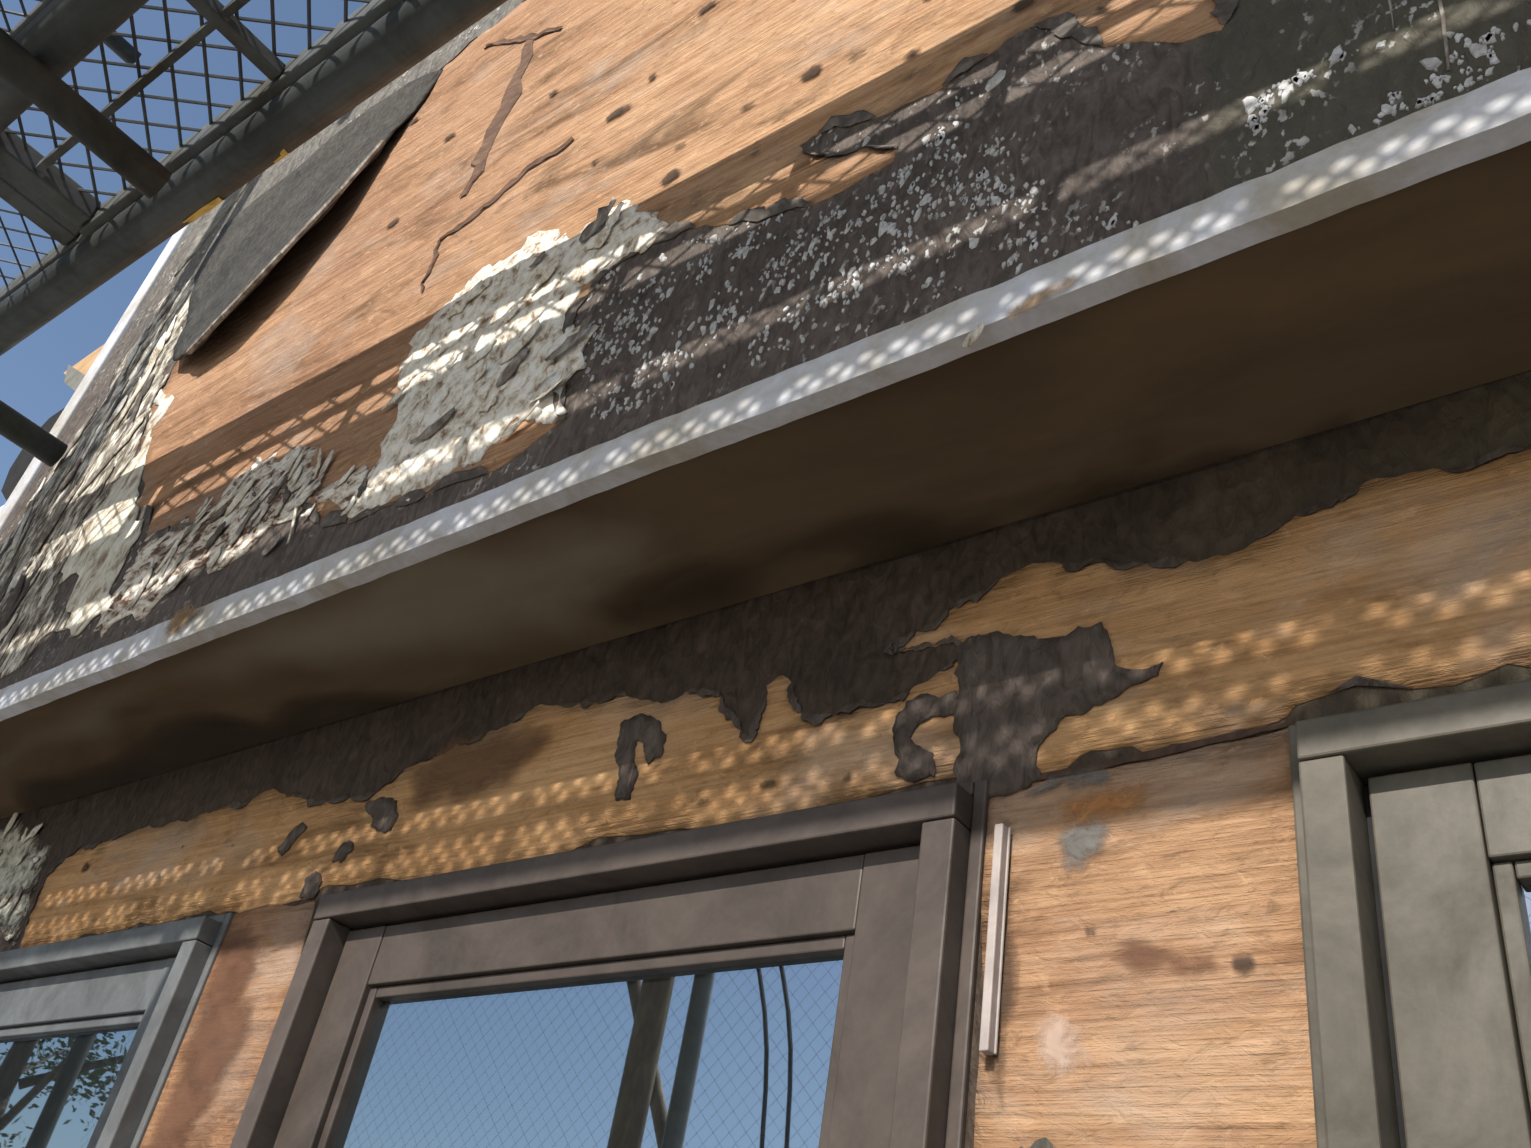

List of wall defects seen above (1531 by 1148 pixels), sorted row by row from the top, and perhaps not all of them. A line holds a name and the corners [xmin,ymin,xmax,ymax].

crack [420,26,574,292]
peeling [0,0,1238,679]
water stain [414,733,544,803]
peeling [0,445,1531,1148]
water stain [151,935,252,1148]